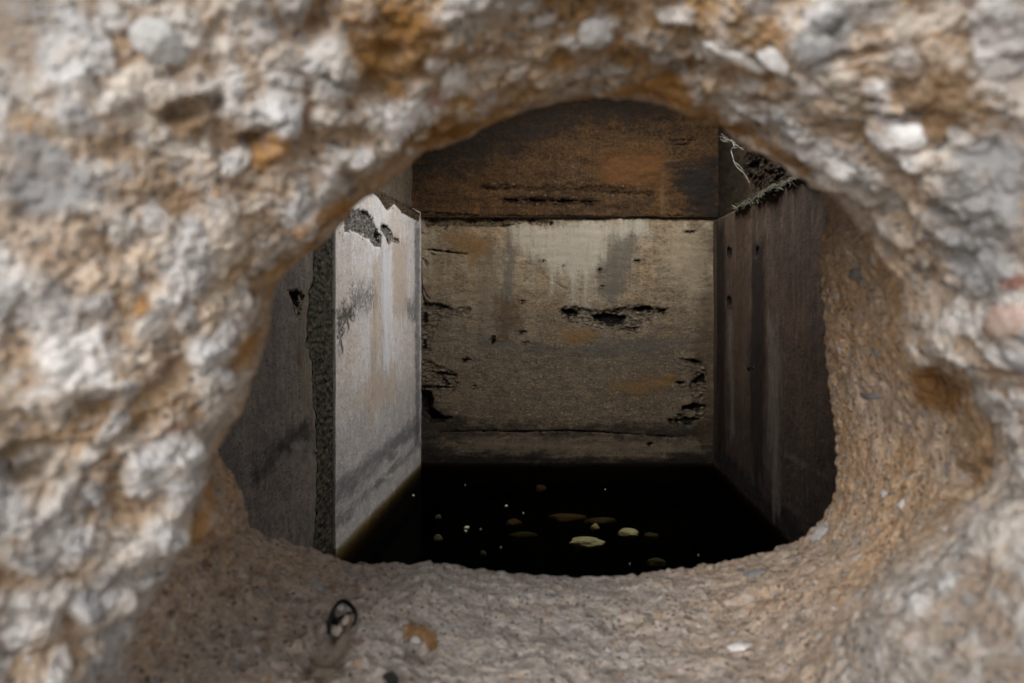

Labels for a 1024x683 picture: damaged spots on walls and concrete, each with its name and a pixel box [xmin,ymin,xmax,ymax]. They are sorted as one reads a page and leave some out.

rust [422,116,475,149]
spalling [288,209,401,555]
spalling [421,299,473,423]
water stain [336,220,806,544]
spalling [557,304,672,333]
spalling [668,359,708,424]